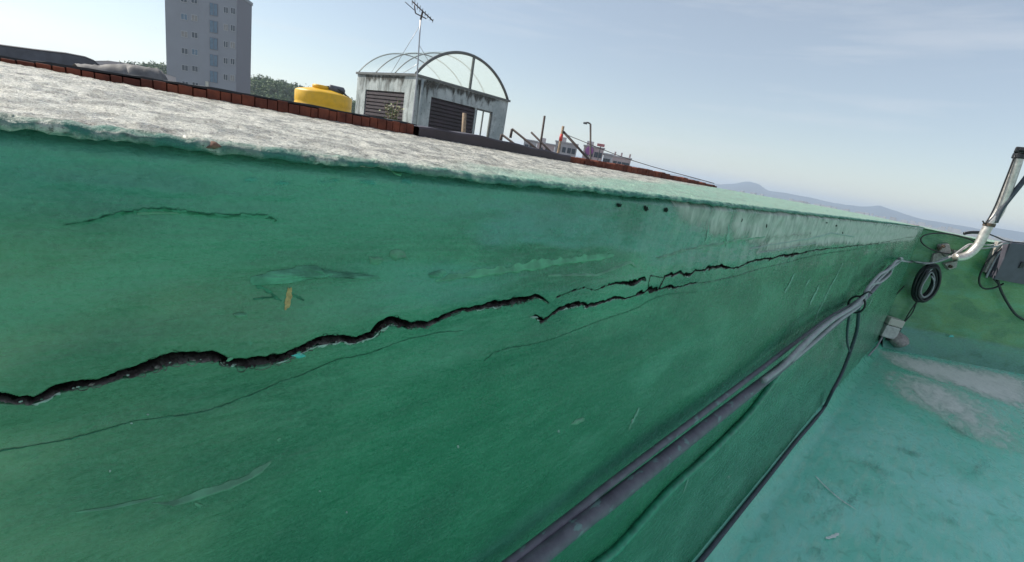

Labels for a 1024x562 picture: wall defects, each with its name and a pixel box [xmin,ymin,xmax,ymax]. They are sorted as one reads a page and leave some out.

crack [0,237,909,452]